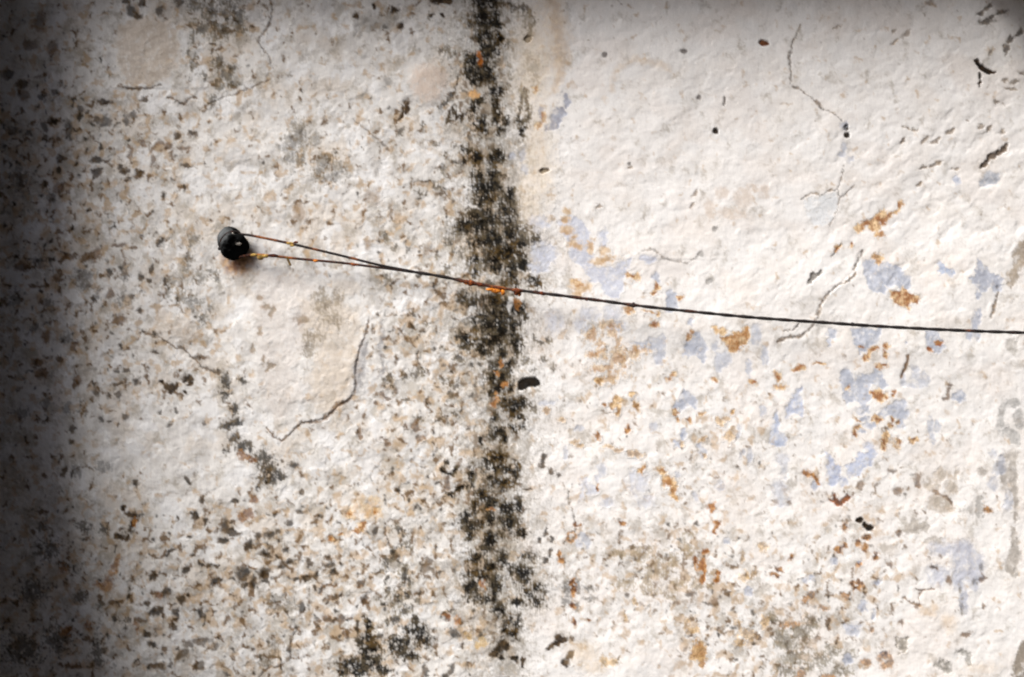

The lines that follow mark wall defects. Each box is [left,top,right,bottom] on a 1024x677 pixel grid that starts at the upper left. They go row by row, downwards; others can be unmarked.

crack [787,23,843,121]
peeling [701,181,772,227]
crack [356,315,371,358]
damp [117,0,716,677]
peeling [516,198,942,511]
peeling [924,330,947,355]
peeling [935,240,1024,343]
damp [8,365,143,446]
crack [265,388,356,443]
spalling [855,517,875,533]
peeling [901,394,1024,618]
damp [0,503,140,677]